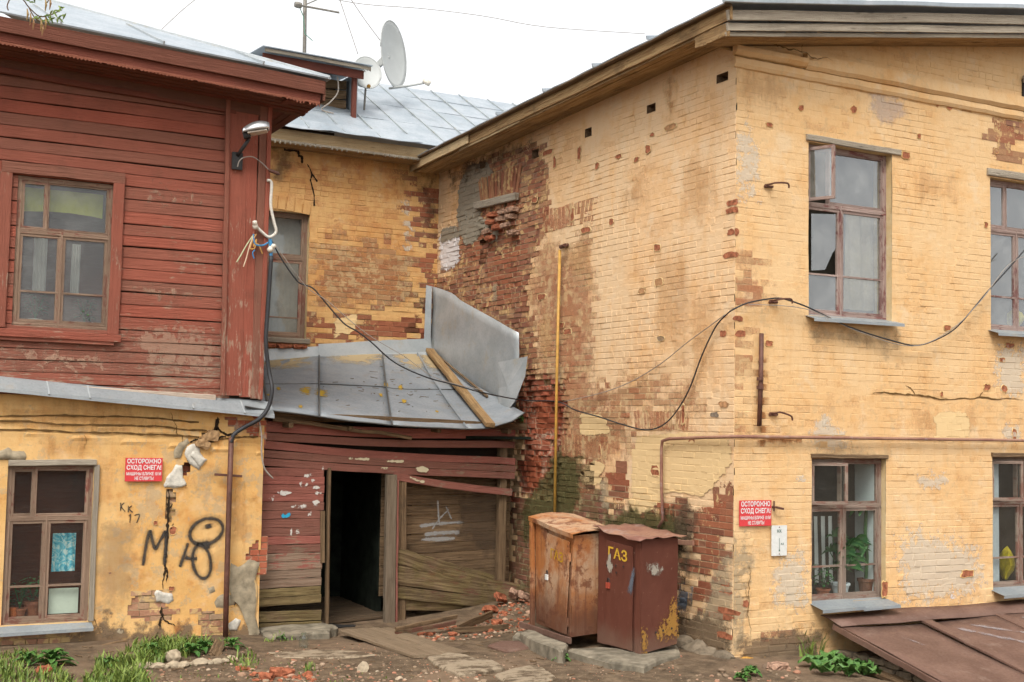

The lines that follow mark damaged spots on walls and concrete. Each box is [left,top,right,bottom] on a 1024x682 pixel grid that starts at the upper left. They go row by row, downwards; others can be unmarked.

flaking render [982,117,1024,167]
crack [284,149,318,206]
flaking render [306,140,743,628]
crack [876,385,1020,400]
crack [155,490,175,639]
flaking render [245,536,268,575]
flaking render [127,586,232,635]